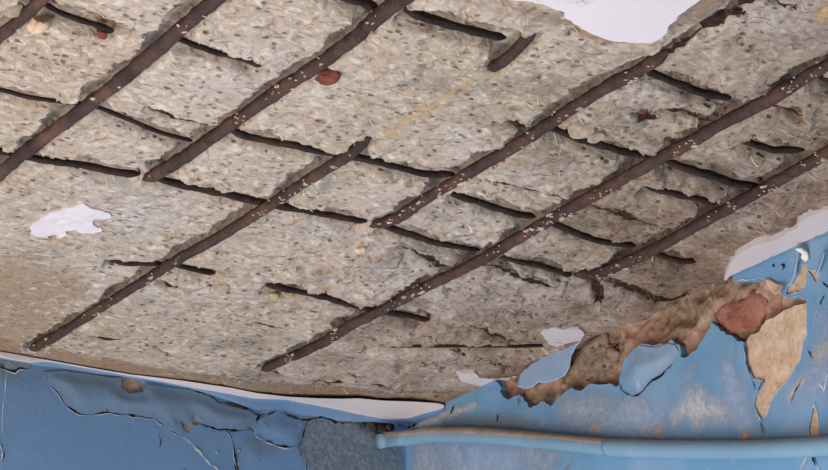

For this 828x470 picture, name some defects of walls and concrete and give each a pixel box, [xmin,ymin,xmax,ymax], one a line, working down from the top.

spalling [0,0,202,164]
spalling [671,73,828,184]
peeling [786,248,825,295]
spalling [122,371,143,393]
crack [0,363,351,470]
flaking render [505,277,807,420]